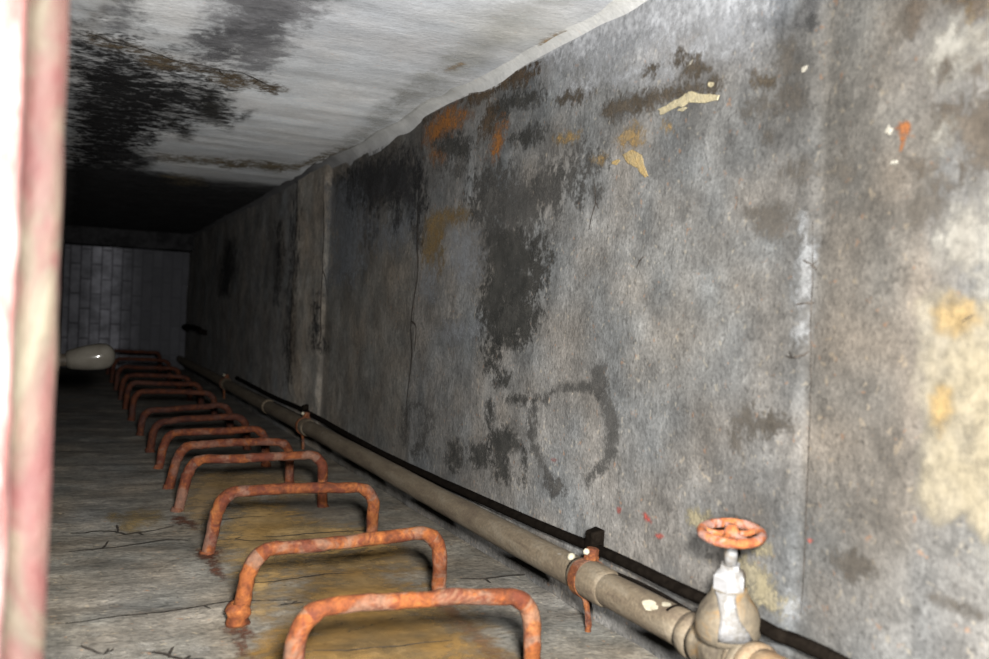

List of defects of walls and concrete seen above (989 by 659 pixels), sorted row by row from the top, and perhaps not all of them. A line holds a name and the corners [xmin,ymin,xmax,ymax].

water stain [64,0,324,171]
rust [423,62,540,164]
water stain [487,88,584,123]
flaking render [612,150,649,177]
water stain [602,46,722,147]
flaking render [658,82,720,115]
rust [897,122,911,150]
crack [404,207,419,442]
water stain [434,130,619,498]
crack [75,525,183,551]
crack [199,516,366,541]
crack [65,572,354,654]